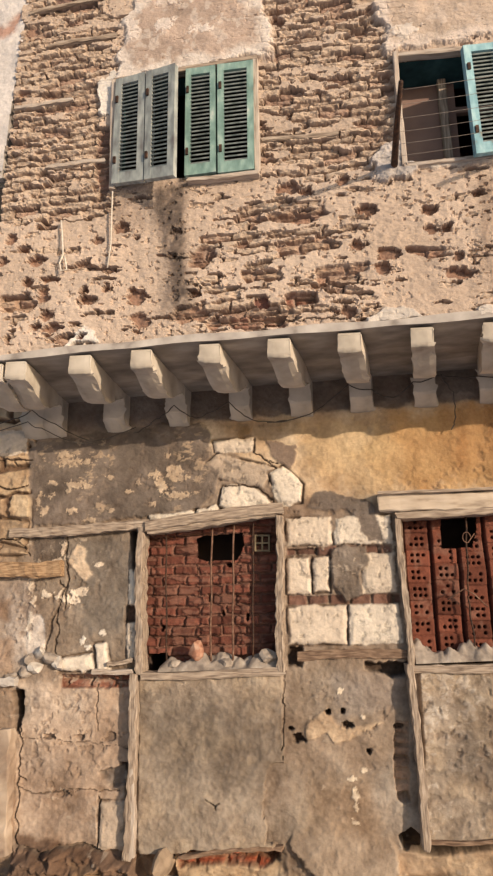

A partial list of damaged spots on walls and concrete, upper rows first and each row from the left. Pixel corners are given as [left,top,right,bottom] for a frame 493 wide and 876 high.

spalling [95,126,110,199]
spalling [0,233,65,339]
flaking render [76,281,113,305]
flaking render [126,286,152,334]
damp [158,187,189,305]
spalling [173,179,473,332]
peeling [28,422,220,528]
crack [45,537,70,654]
peeling [25,541,104,640]
crack [15,683,128,859]
flaking render [289,707,382,744]
spalling [393,721,411,801]